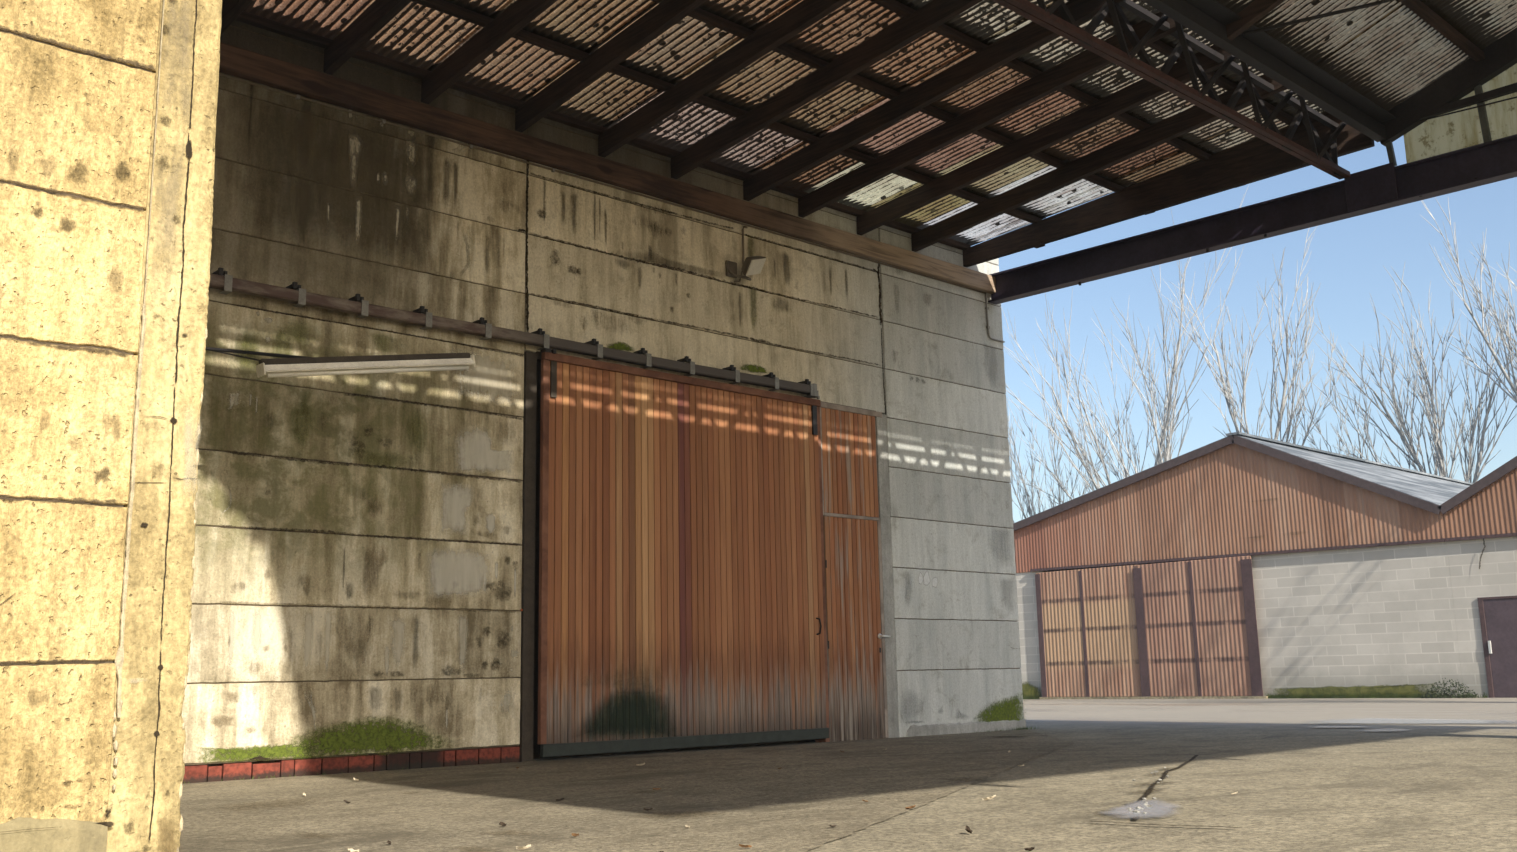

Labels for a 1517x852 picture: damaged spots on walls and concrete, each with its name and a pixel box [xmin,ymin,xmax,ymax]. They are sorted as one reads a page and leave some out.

damp [532,173,876,317]
damp [531,293,878,365]
damp [442,619,509,675]